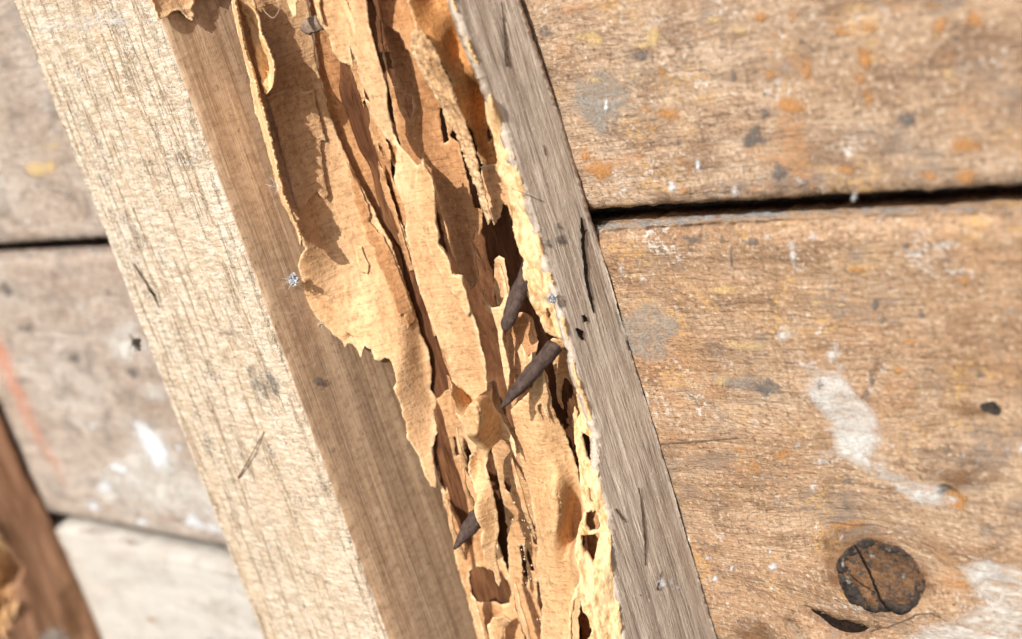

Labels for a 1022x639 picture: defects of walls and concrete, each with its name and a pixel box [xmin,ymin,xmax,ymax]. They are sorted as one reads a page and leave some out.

peeling [267,88,329,213]
peeling [346,50,415,329]
peeling [415,160,471,316]
peeling [529,373,551,423]
crack [811,522,948,633]